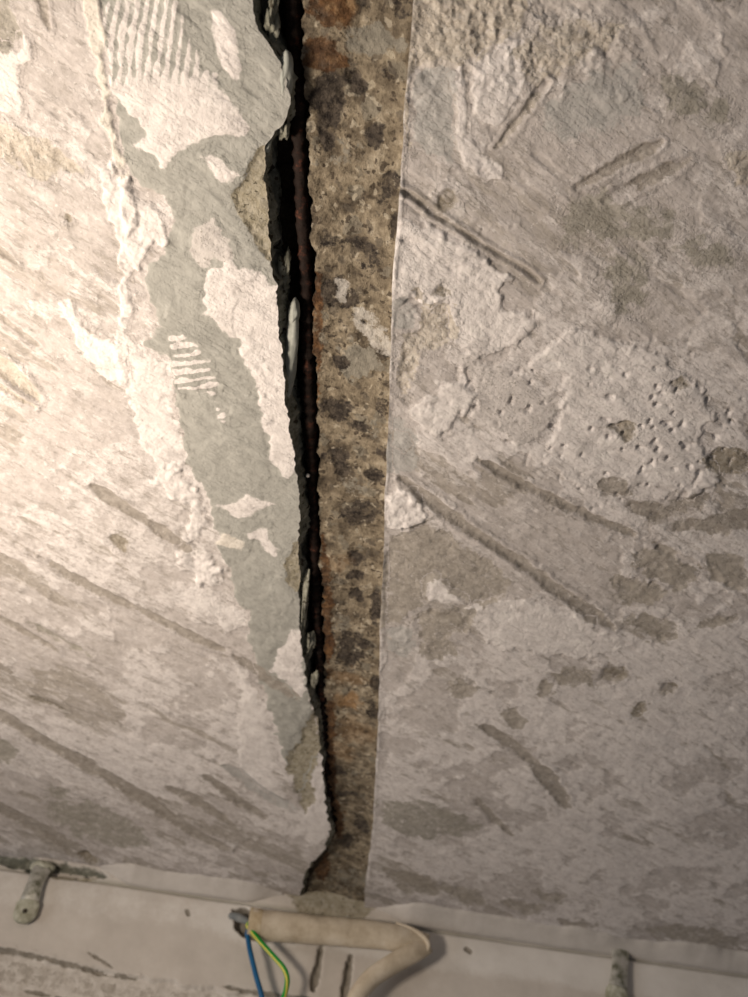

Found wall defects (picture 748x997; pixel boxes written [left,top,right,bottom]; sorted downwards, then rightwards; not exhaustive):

spalling [0,0,58,59]
spalling [0,70,338,895]
spalling [253,0,287,66]
corrosion [283,0,367,884]